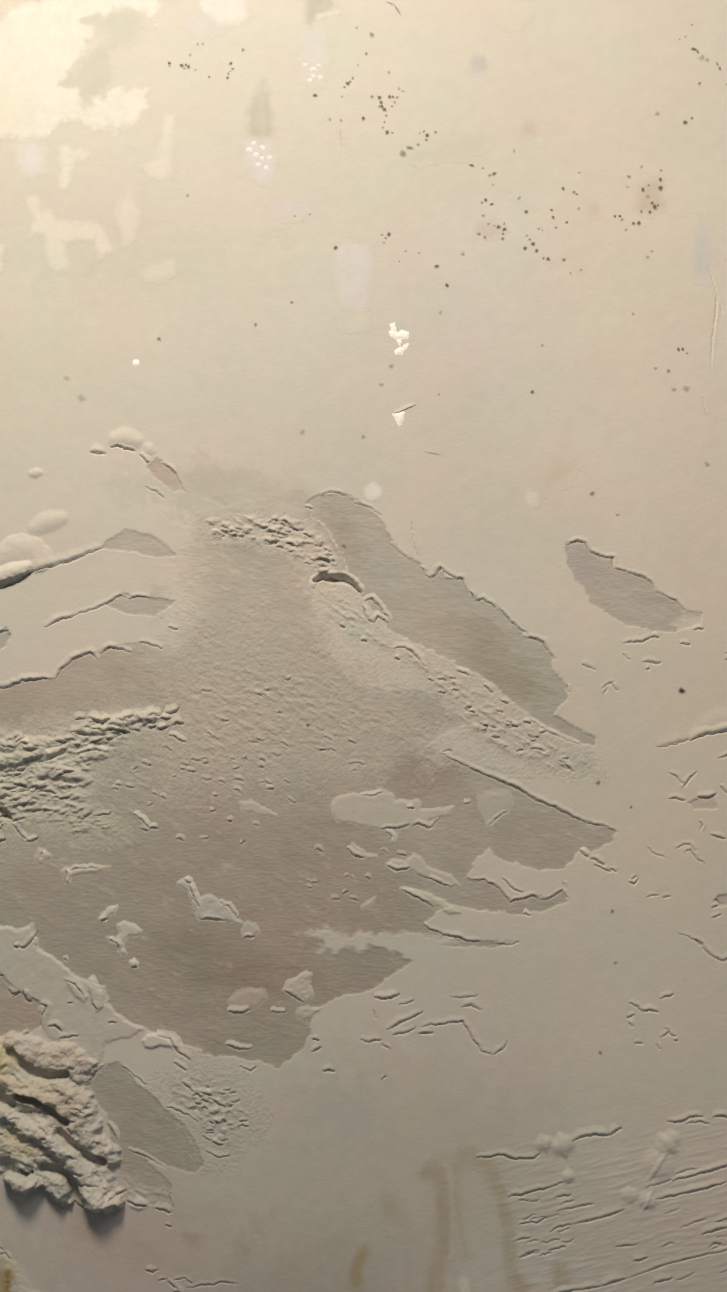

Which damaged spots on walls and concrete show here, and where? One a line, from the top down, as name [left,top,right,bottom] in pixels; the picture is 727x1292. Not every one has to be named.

water stain [295,0,343,97]
water stain [370,70,405,135]
water stain [241,76,315,249]
water stain [468,163,669,274]
peeling [90,442,183,498]
peeling [564,535,703,634]
crack [655,702,727,747]
peeling [0,487,619,1227]
crack [579,839,706,897]
crack [570,1123,620,1141]
crack [667,1108,727,1124]
crack [475,1147,727,1292]